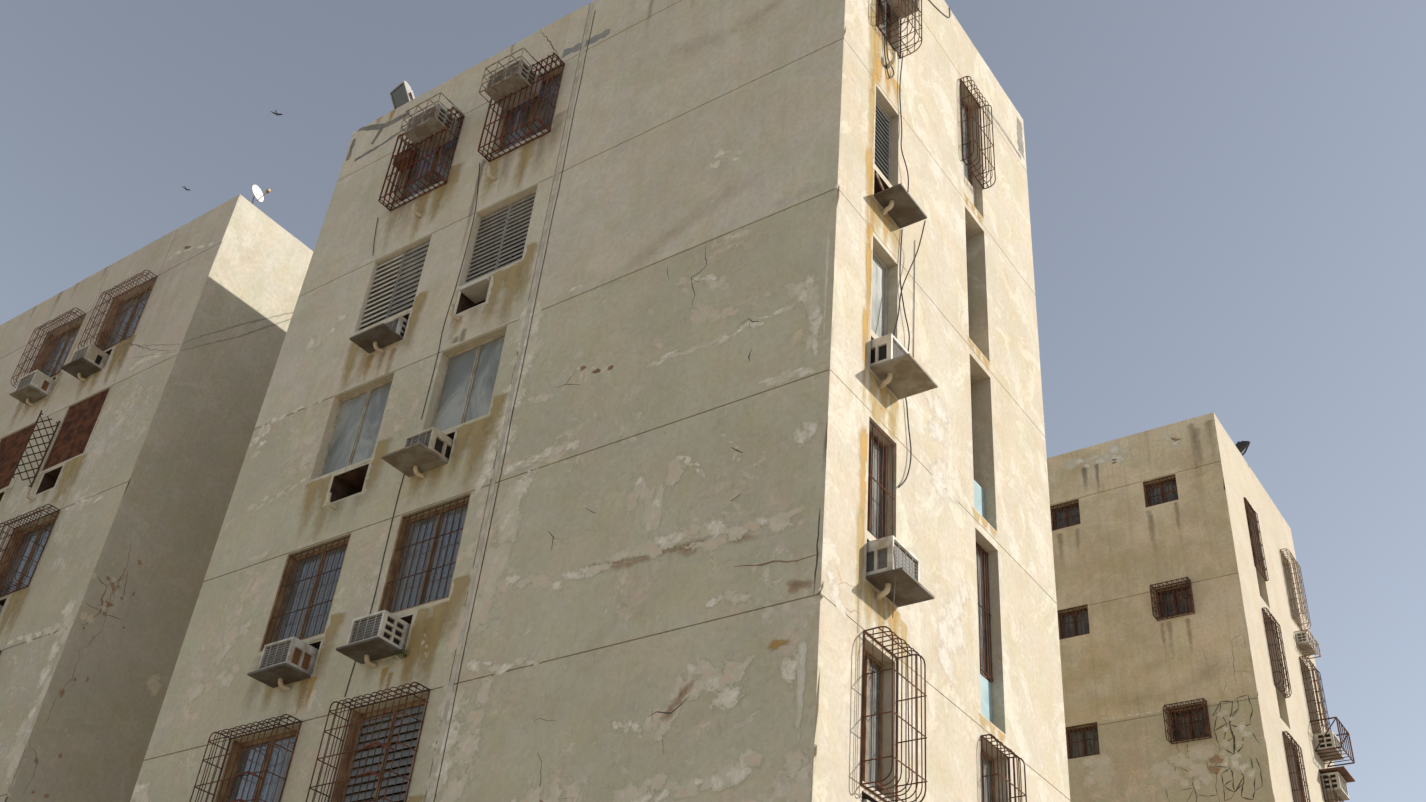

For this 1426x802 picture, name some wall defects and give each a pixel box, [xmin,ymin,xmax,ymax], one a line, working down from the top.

crack [667,248,707,304]
rust [863,0,900,423]
crack [6,541,132,802]
peeling [421,292,813,802]
peeling [791,420,819,450]
rust [858,430,896,632]